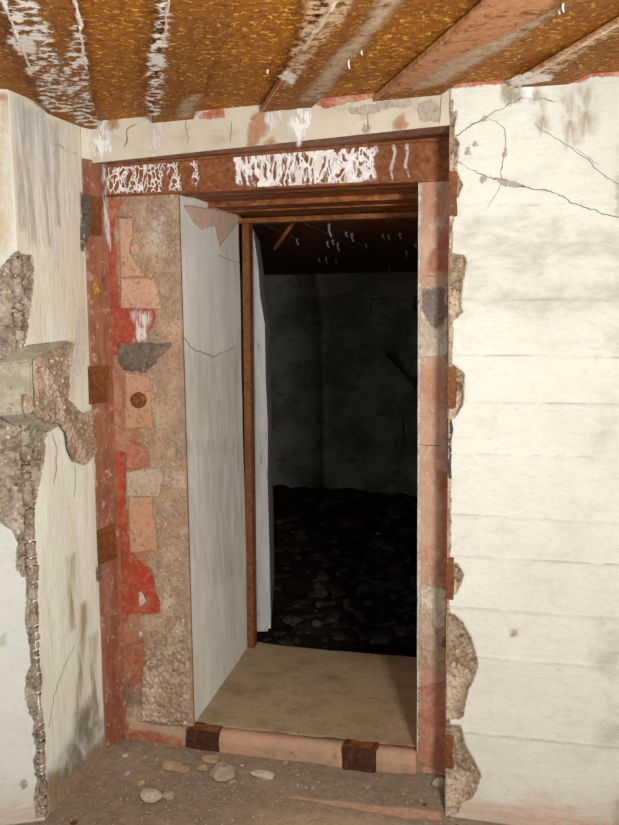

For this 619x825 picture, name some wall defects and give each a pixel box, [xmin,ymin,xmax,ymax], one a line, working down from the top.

leakage [0,0,182,263]
leakage [178,94,201,118]
peeling [199,108,225,119]
corrosion [247,112,274,146]
crack [439,94,619,218]
spalling [0,250,34,361]
crack [370,296,418,320]
crack [384,351,418,394]
spalling [60,399,97,465]
peeling [309,0,554,817]
spalling [0,394,48,818]
corrosion [71,596,86,632]